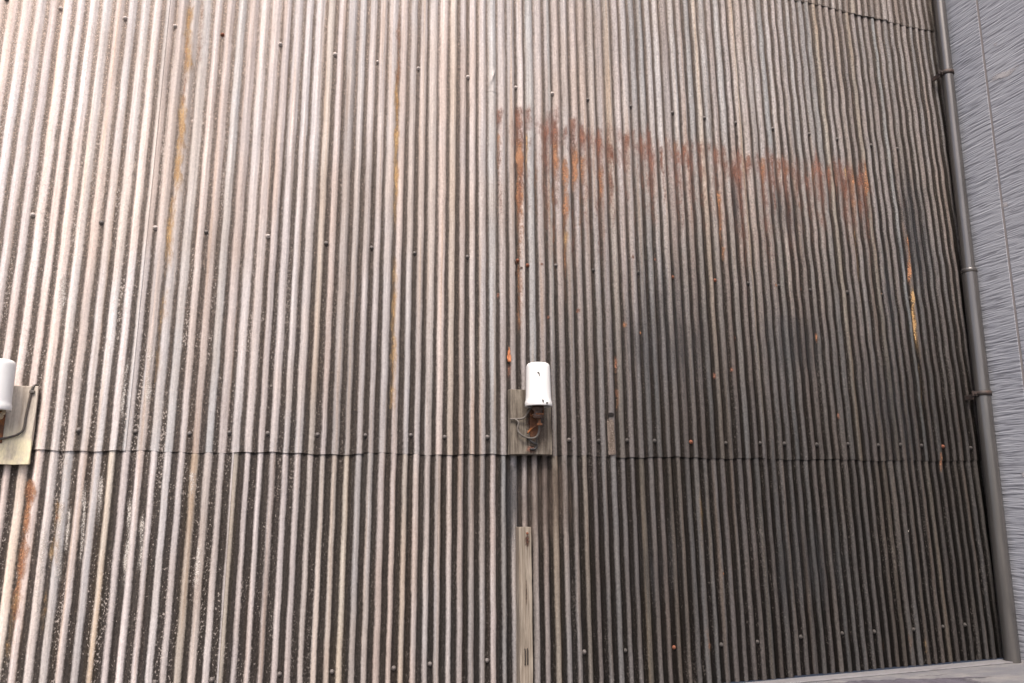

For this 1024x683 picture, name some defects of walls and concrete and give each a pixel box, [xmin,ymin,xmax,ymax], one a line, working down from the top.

rust [515,107,664,260]
rust [807,156,869,210]
rust [907,237,916,340]
rust [13,480,36,619]